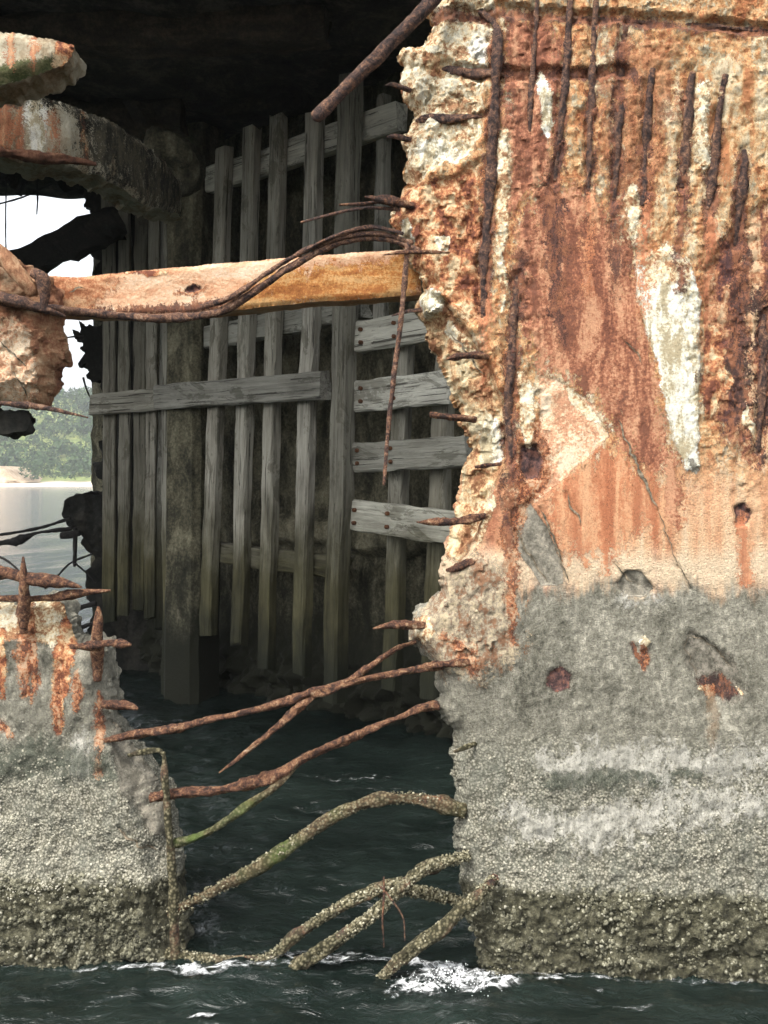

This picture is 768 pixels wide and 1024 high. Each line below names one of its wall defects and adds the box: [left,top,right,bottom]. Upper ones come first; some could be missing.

corrosion [1,32,74,73]
corrosion [0,104,25,159]
spalling [0,315,39,403]
corrosion [49,252,421,314]
spalling [390,0,609,586]
corrosion [430,4,768,648]
crack [617,418,692,589]
spalling [0,601,67,652]
corrosion [0,602,106,781]
spalling [109,719,175,839]